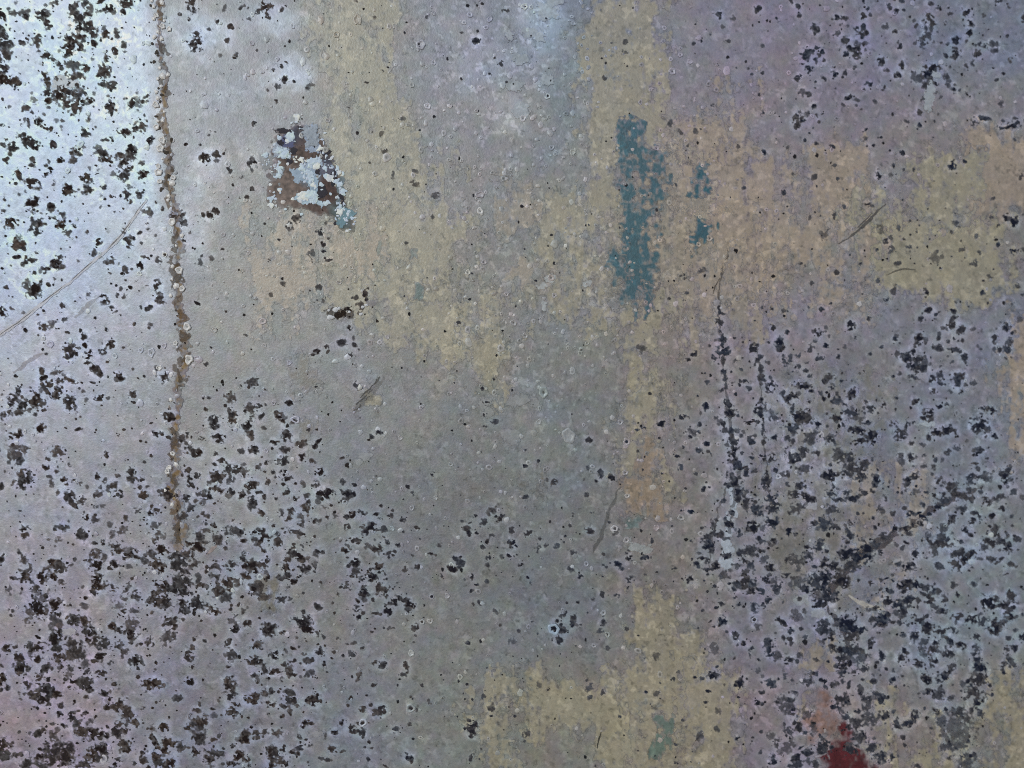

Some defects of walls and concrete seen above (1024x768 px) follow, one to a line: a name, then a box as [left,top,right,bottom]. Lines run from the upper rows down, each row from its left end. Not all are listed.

rust [149,0,193,554]
mould [0,377,423,768]
mould [177,0,287,59]
peeling [255,114,357,232]
leakage [237,0,1024,768]